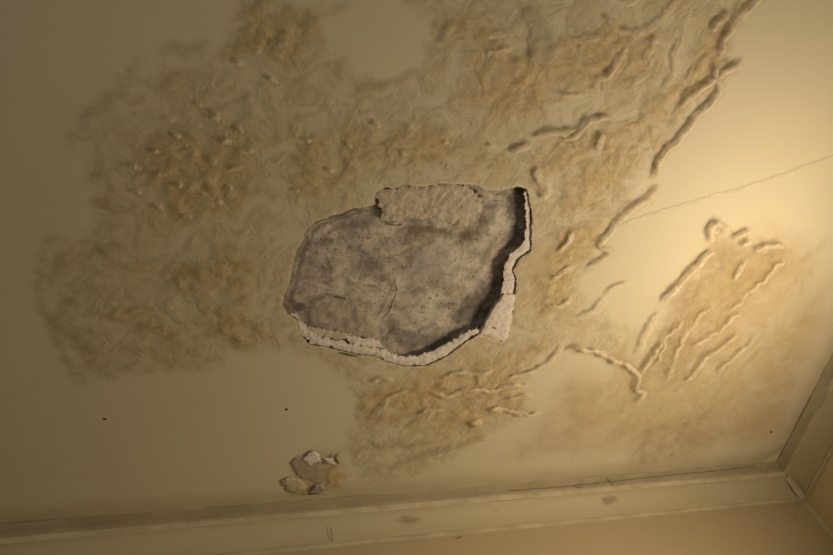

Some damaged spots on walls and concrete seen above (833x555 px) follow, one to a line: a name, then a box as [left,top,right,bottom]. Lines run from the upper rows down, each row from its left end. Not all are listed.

damp [61,0,729,476]
spalling [283,184,532,367]
peeling [282,450,339,495]